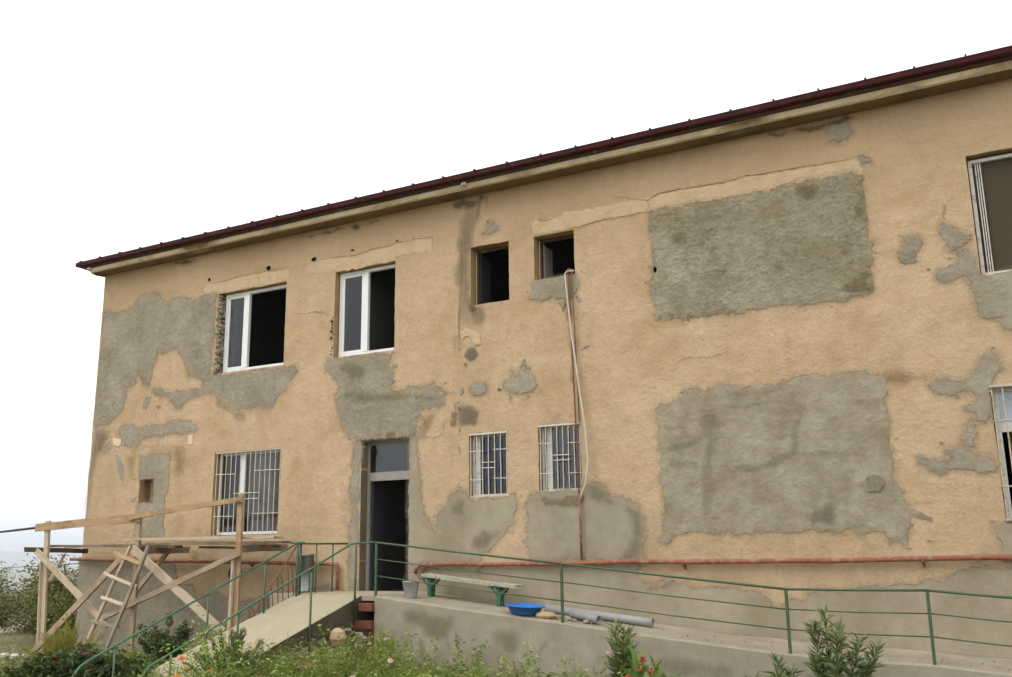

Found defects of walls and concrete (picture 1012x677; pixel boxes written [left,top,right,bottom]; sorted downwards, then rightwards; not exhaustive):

spalling [898,234,923,264]
spalling [939,205,971,251]
spalling [93,292,299,508]
spalling [324,317,536,487]
spalling [916,346,1005,475]